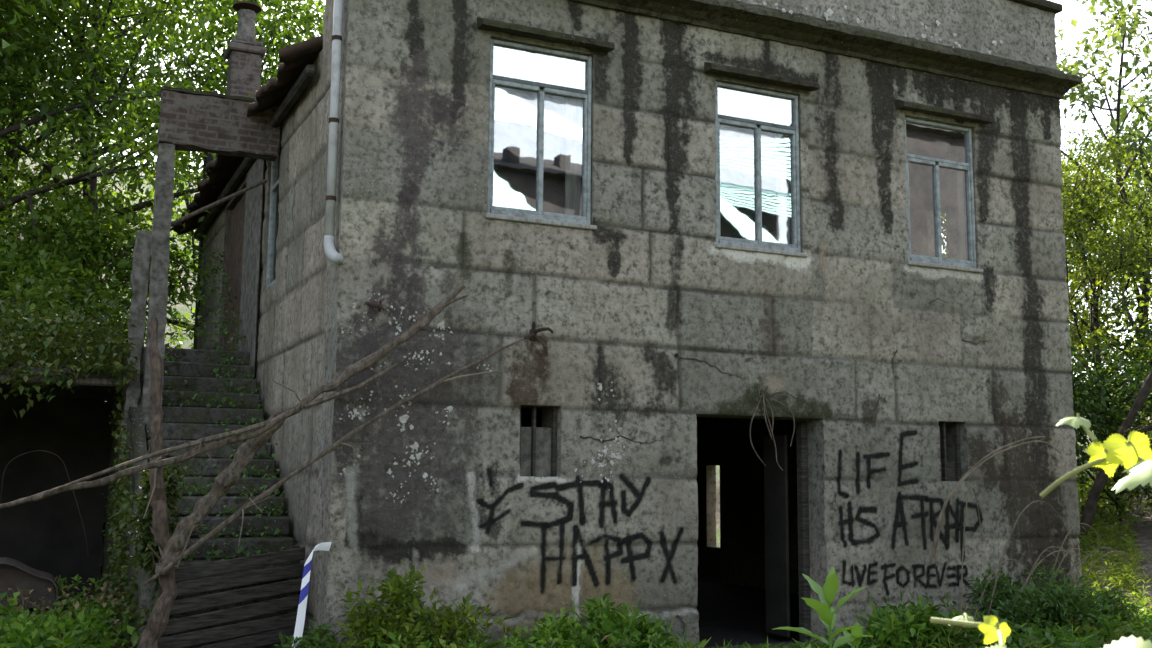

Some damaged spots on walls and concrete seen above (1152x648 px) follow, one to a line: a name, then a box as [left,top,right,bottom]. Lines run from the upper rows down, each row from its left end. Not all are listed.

leakage [332,0,500,613]
leakage [591,346,677,427]
leakage [657,20,845,328]
leakage [861,59,1079,600]